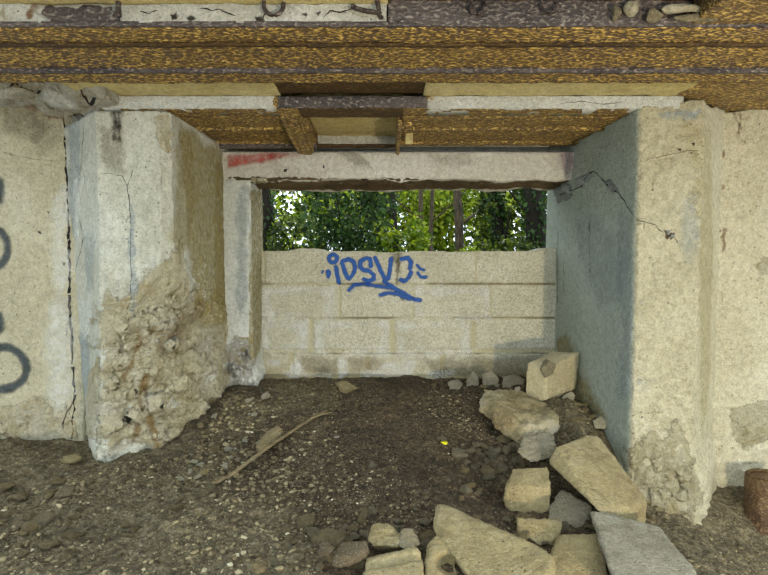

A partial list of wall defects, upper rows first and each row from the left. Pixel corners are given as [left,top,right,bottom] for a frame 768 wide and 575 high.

spalling [0,82,120,122]
crack [3,83,96,439]
crack [103,171,133,322]
crack [560,171,679,245]
spalling [0,238,257,449]
spalling [627,420,704,515]
spalling [730,400,768,451]